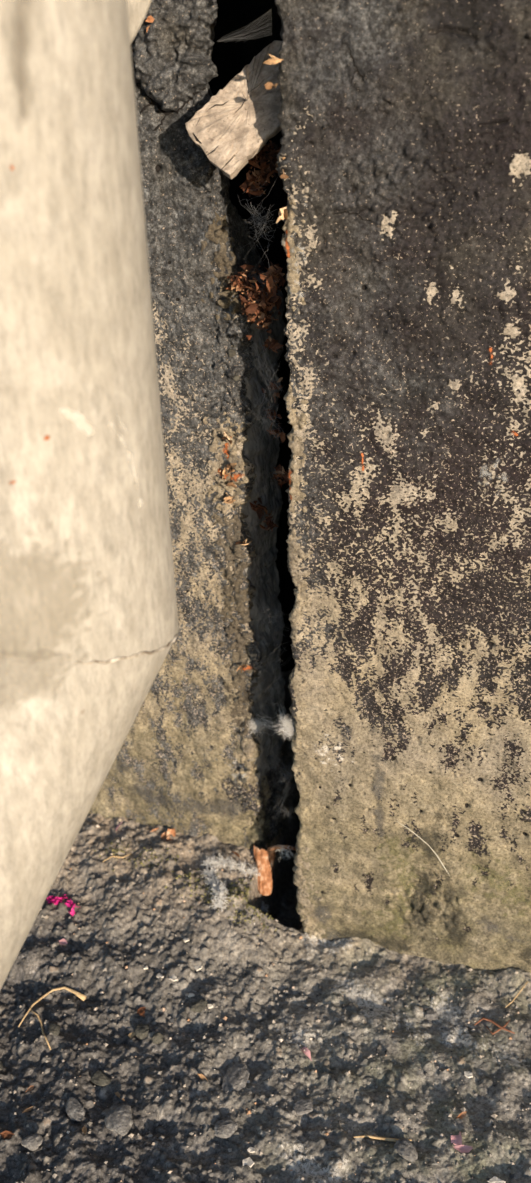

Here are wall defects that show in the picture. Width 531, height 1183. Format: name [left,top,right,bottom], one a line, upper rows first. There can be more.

crack [133,0,283,131]
crack [228,129,297,672]
water stain [302,898,412,955]
water stain [407,831,466,942]